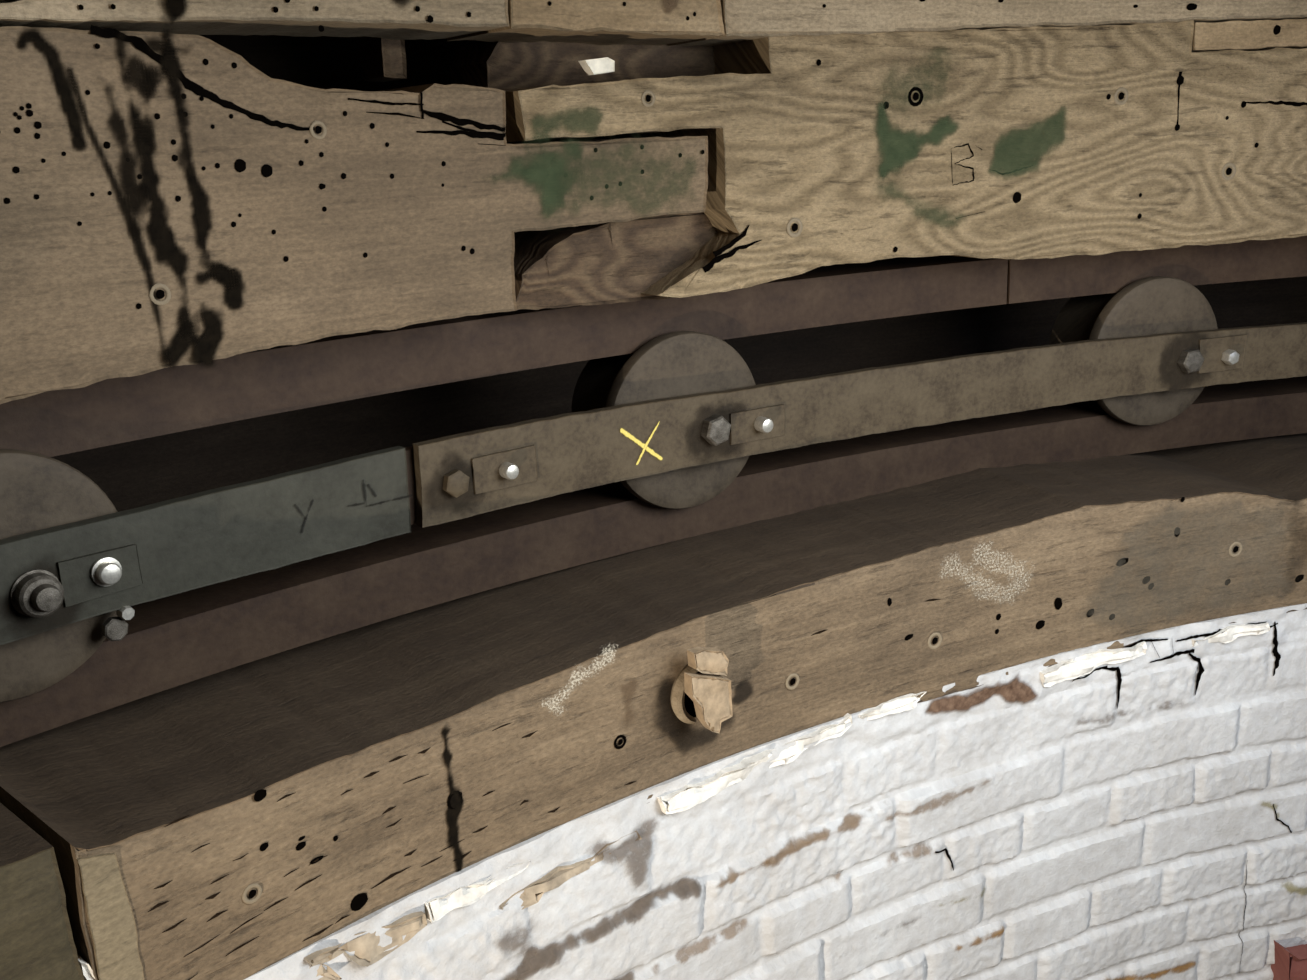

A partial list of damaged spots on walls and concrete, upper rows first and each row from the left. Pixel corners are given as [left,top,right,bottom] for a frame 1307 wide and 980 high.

crack [90,25,315,131]
crack [348,92,506,146]
crack [1246,99,1307,107]
peeling [926,677,1037,714]
crack [1072,621,1281,709]
spalling [371,826,487,889]
peeling [594,822,652,884]